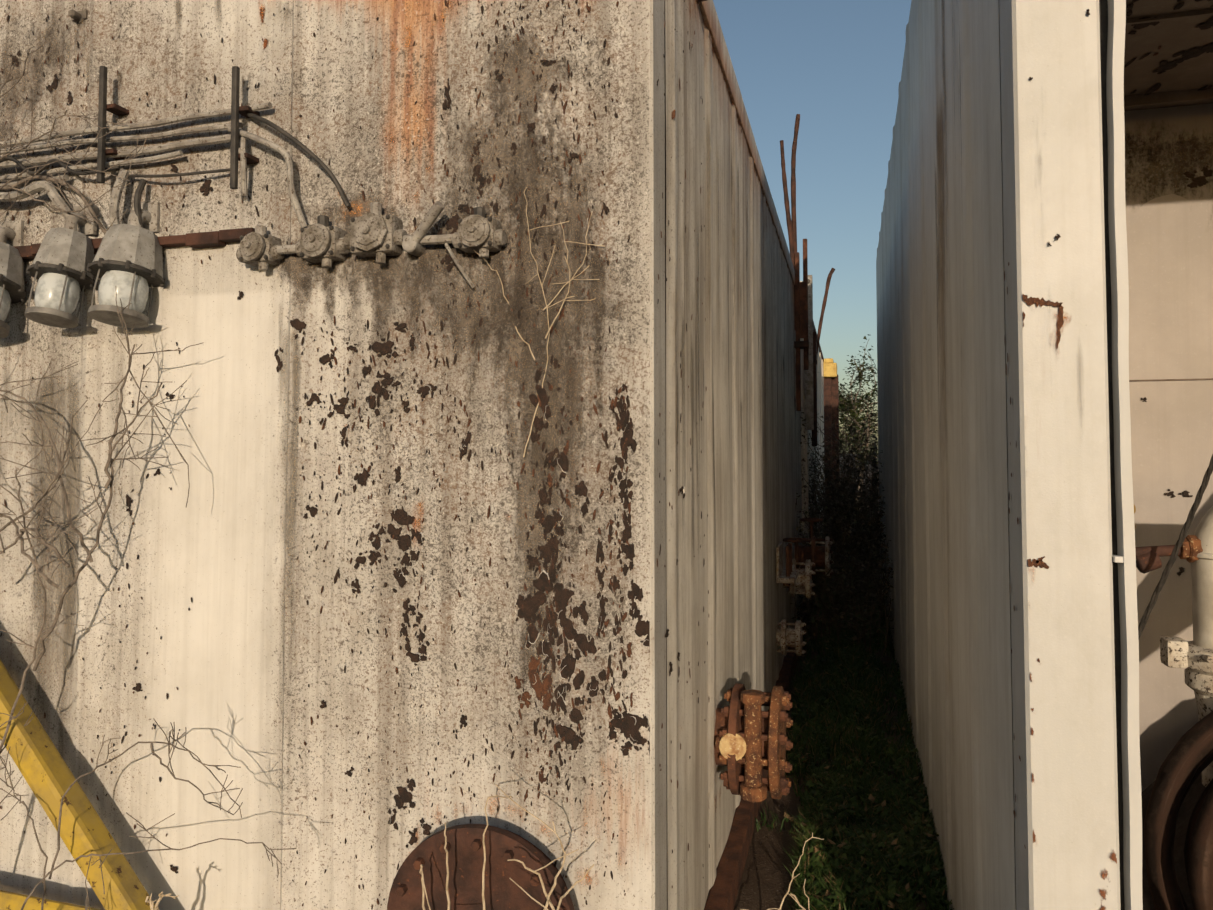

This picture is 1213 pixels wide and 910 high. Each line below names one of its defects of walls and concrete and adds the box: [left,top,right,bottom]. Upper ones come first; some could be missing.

peeling [1,15,89,191]
peeling [1126,0,1160,35]
peeling [1124,43,1213,95]
peeling [160,136,280,227]
water stain [471,175,586,529]
water stain [593,255,605,410]
peeling [290,0,678,865]